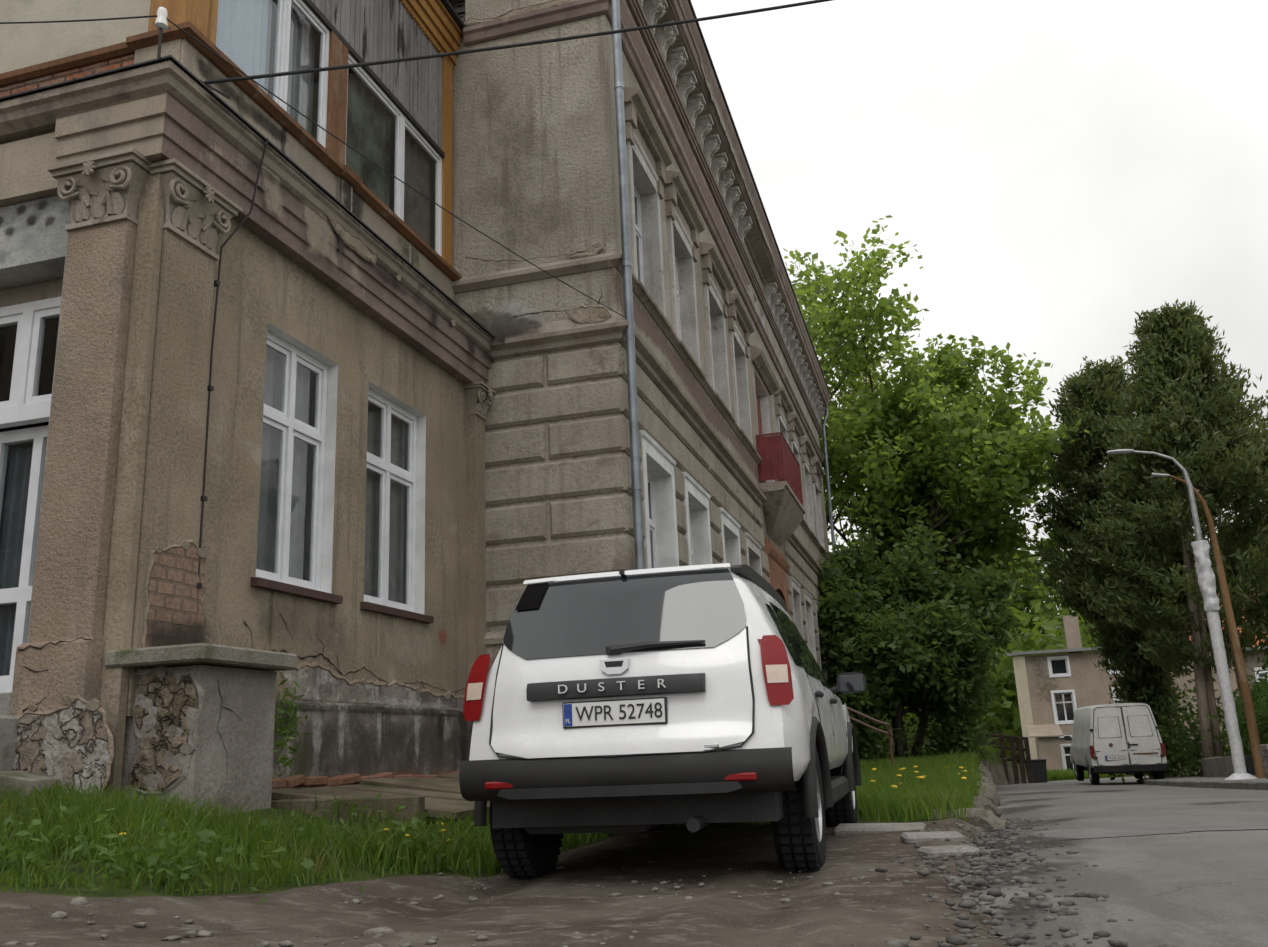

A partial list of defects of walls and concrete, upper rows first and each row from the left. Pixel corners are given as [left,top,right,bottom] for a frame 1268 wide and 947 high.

peeling [141,539,209,648]
crack [244,614,464,698]
spalling [128,666,205,797]